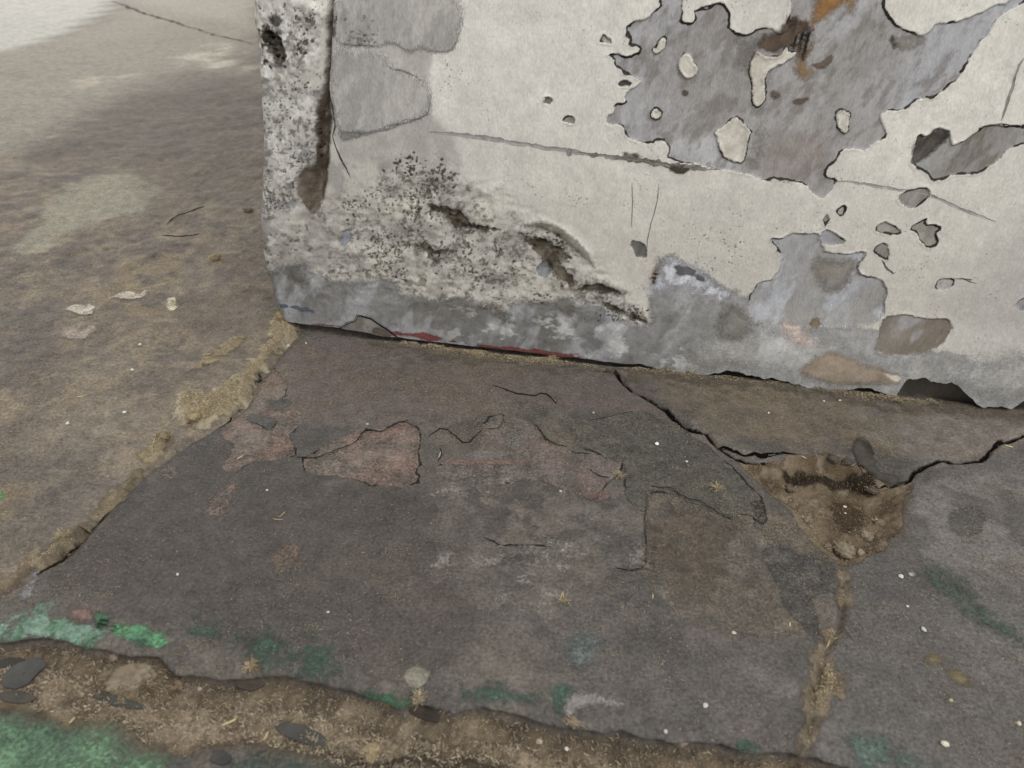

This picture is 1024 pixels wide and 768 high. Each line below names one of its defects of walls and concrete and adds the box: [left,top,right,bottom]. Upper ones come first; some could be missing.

peeling [600,0,1024,208]
peeling [266,152,1024,409]
crack [305,420,408,459]
crack [428,385,557,461]
crack [602,370,797,465]
crack [857,435,1024,493]
crack [483,537,551,547]
crack [618,486,733,571]